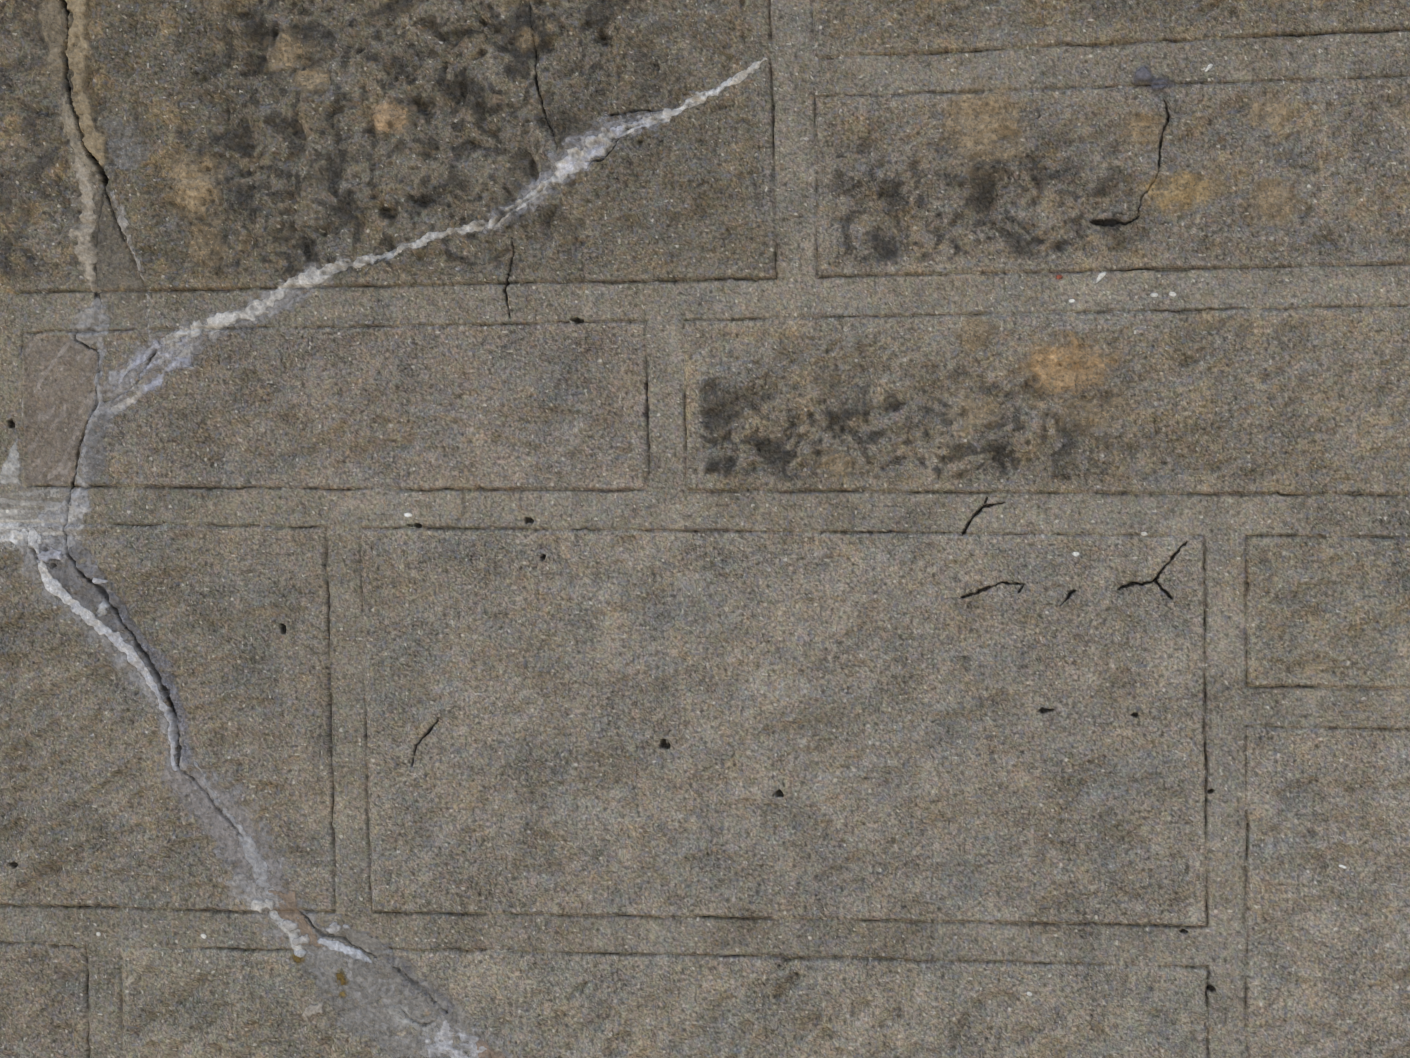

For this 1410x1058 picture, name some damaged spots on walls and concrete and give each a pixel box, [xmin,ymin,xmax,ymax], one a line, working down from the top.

leakage [373,104,406,132]
crack [1091,111,1169,227]
leakage [164,156,223,259]
leakage [29,405,82,480]
crack [0,0,767,1058]
crack [963,497,1002,534]
crack [962,582,1023,598]
crack [1119,543,1186,598]
spalling [302,927,505,1058]